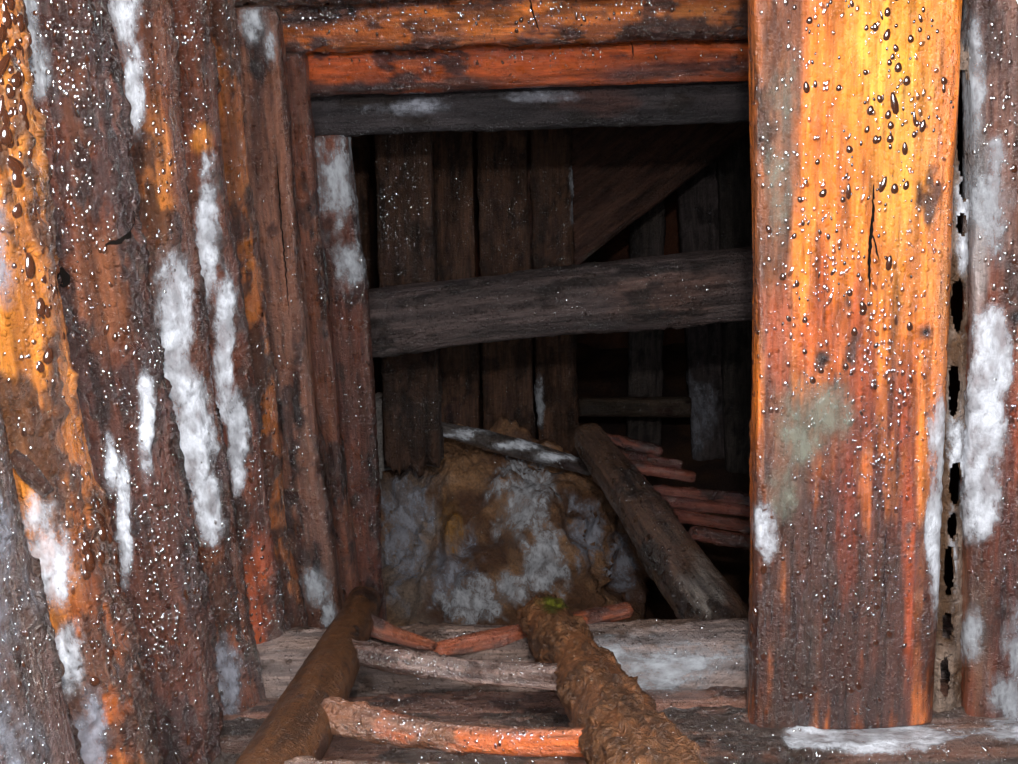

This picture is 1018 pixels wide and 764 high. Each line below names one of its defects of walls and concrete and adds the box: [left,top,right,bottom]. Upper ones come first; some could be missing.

water stain [110,0,145,126]
water stain [962,11,985,138]
water stain [319,135,359,228]
crack [867,184,879,291]
water stain [957,140,1005,271]
water stain [28,499,67,599]
water stain [105,443,132,569]
water stain [139,377,155,451]
water stain [159,188,248,546]
water stain [925,307,1012,608]
water stain [56,632,80,678]
mould [784,726,961,753]